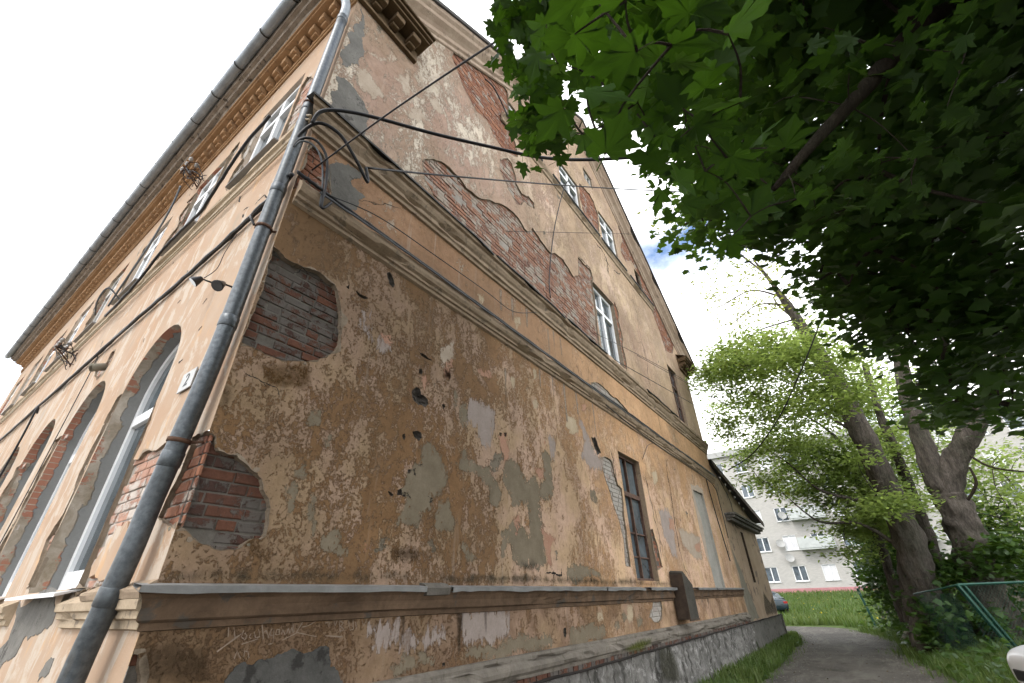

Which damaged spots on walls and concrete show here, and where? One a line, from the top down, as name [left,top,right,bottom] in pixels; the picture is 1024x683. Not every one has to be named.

flaking render [330,9,444,134]
spalling [422,52,600,346]
spalling [241,246,393,365]
spalling [0,394,167,668]
spalling [158,430,271,551]
flaking render [388,431,556,572]
peeling [466,397,507,452]
spalling [566,404,631,567]
flaking render [38,657,54,681]
flaking render [224,646,343,683]